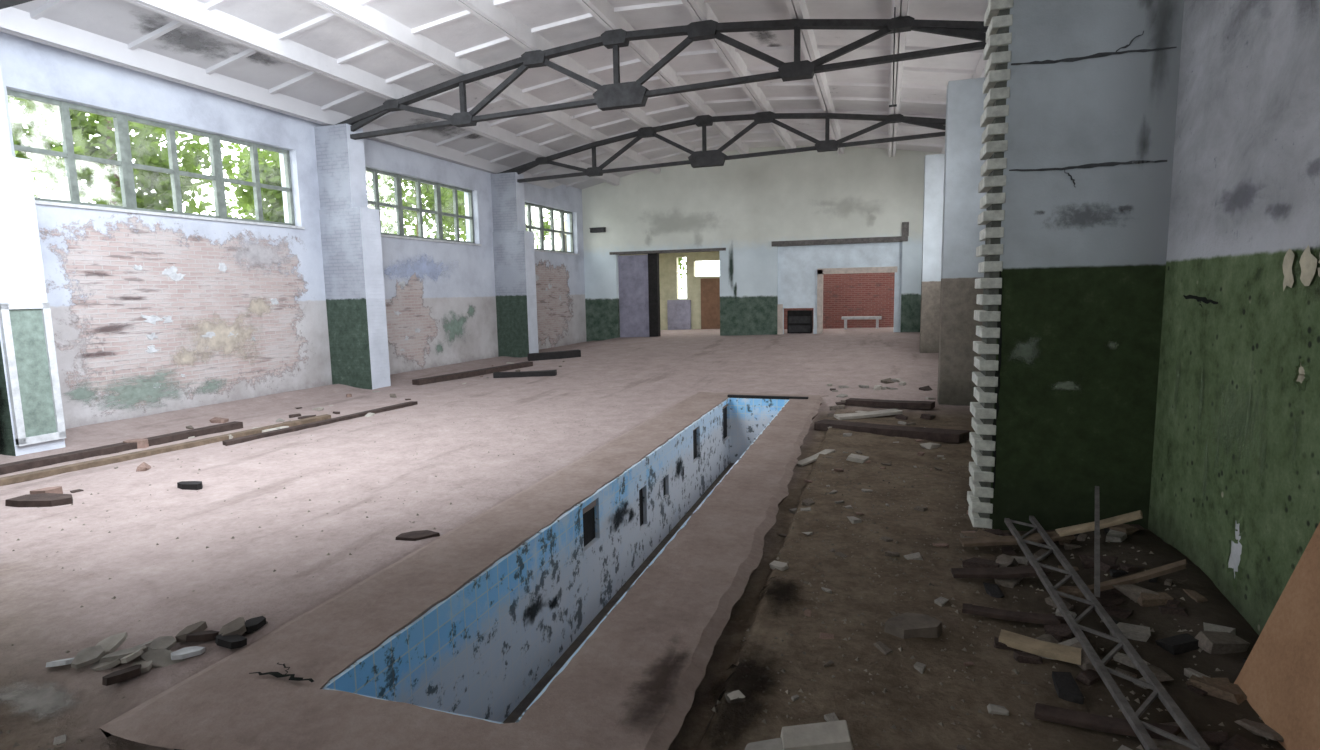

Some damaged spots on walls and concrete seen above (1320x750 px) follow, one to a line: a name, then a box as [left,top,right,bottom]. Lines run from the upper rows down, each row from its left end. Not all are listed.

leakage [144,20,219,51]
leakage [248,53,274,64]
crack [1011,31,1177,65]
crack [1009,160,1167,187]
spalling [1282,245,1320,291]
peeling [40,213,309,414]
peeling [385,273,440,368]
peeling [535,259,574,348]